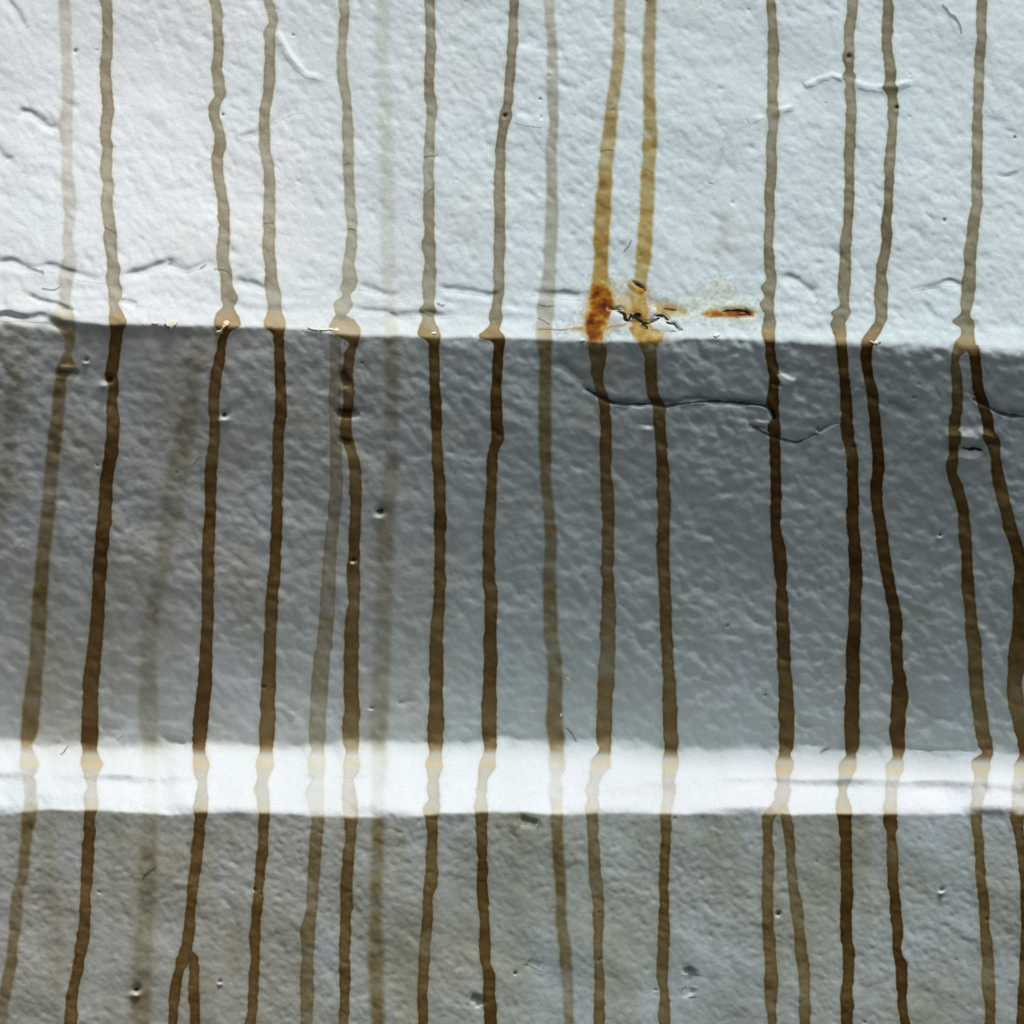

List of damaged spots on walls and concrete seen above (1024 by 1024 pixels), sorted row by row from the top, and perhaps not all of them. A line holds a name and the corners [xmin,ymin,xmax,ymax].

damp [0,0,80,1024]
damp [60,0,130,1024]
damp [127,0,244,1024]
damp [241,0,290,1024]
damp [296,0,450,1024]
damp [470,0,522,1024]
damp [533,0,577,1024]
corrosion [554,0,762,1024]
crack [585,387,840,444]
damp [757,0,815,1024]
damp [827,0,914,1024]
damp [943,0,1024,1024]